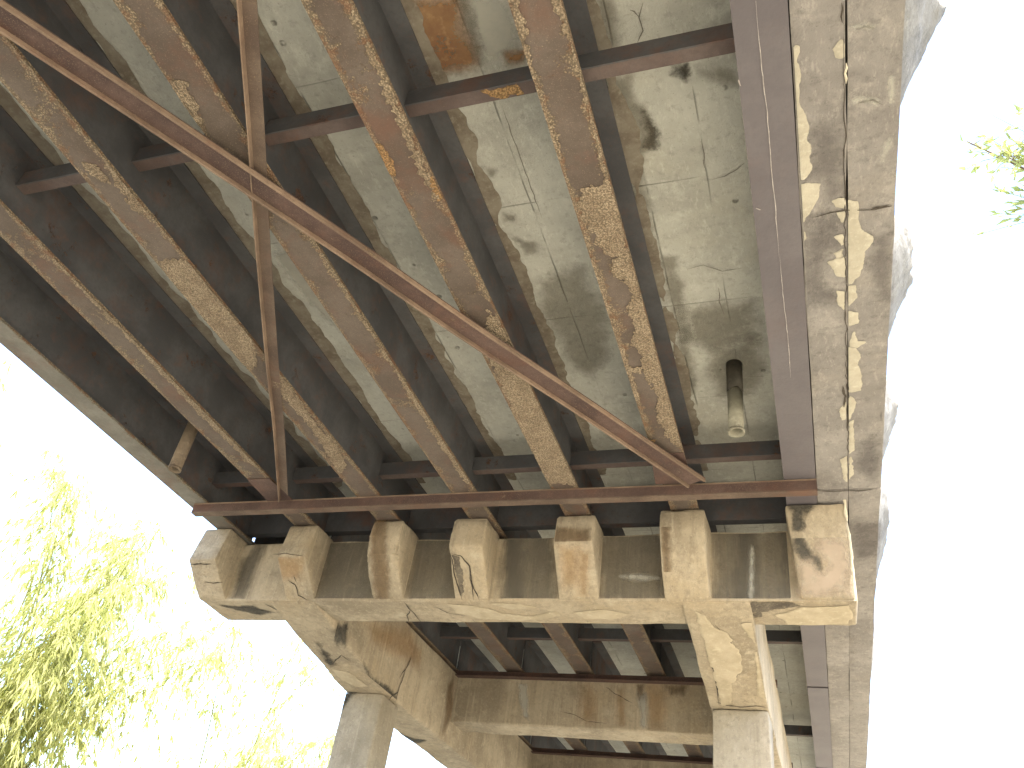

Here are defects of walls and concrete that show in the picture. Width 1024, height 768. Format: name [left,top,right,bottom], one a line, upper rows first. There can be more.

corrosion [481,0,562,161]
corrosion [551,0,681,446]
crack [631,4,644,41]
damp [642,111,660,150]
peeling [793,45,821,241]
peeling [832,39,848,83]
crack [812,3,891,464]
corrosion [51,258,259,467]
peeling [827,198,874,482]
damp [334,624,347,645]
damp [713,505,821,599]
peeling [695,538,853,706]